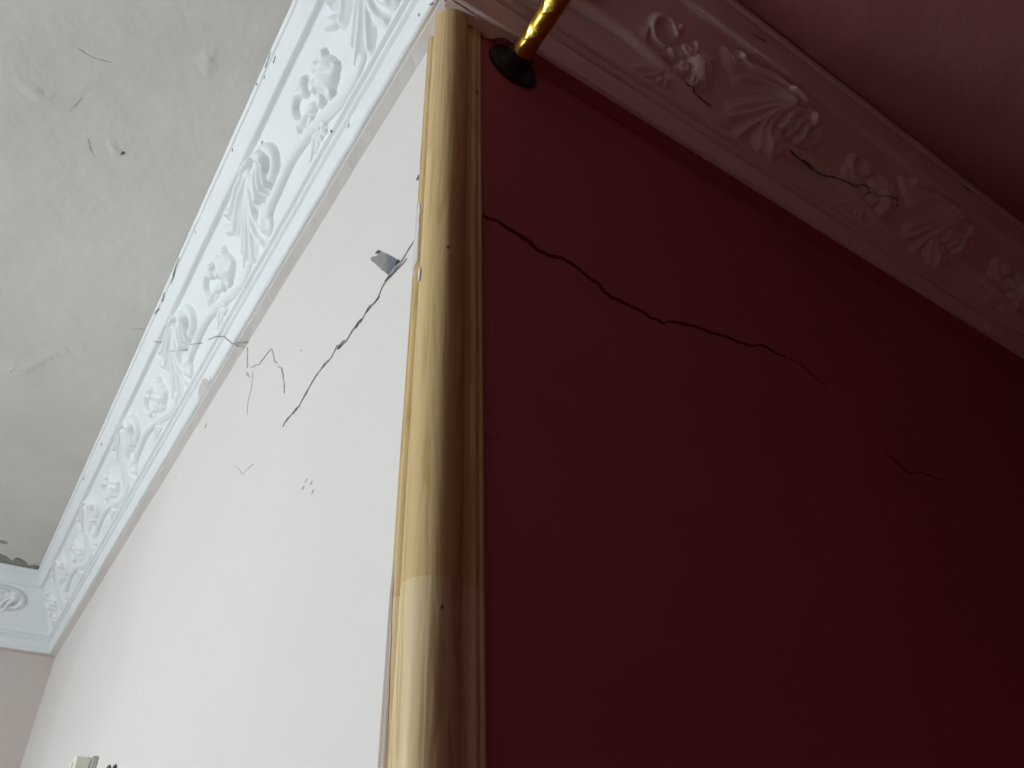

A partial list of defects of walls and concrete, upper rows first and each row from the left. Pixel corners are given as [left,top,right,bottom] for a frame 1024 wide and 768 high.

crack [790,149,898,206]
crack [130,240,414,427]
crack [482,213,827,387]